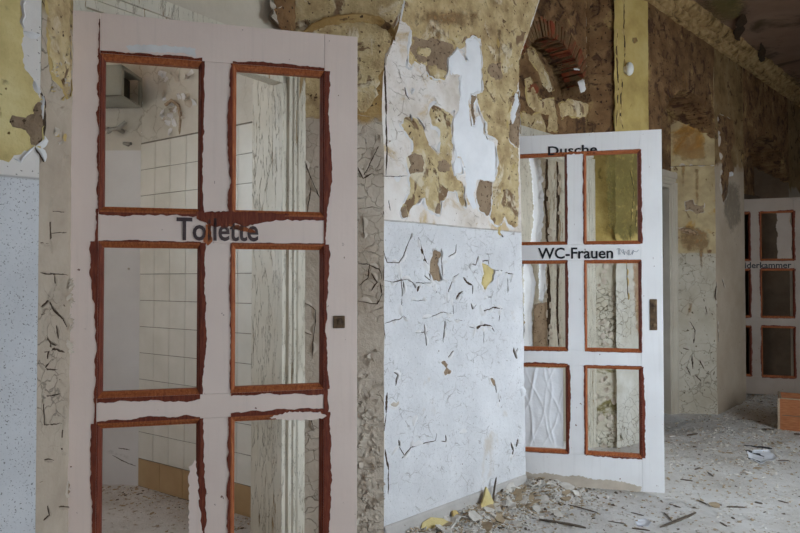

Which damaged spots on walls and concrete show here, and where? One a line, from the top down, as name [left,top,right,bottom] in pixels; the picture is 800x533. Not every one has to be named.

peeling [0,0,67,163]
peeling [274,0,547,242]
crack [39,198,67,463]
crack [358,201,391,238]
spalling [428,248,443,284]
crack [358,233,514,359]
spalling [479,260,496,292]
crack [683,279,725,382]
crack [384,370,467,492]
crack [510,439,520,460]
crack [43,506,69,521]